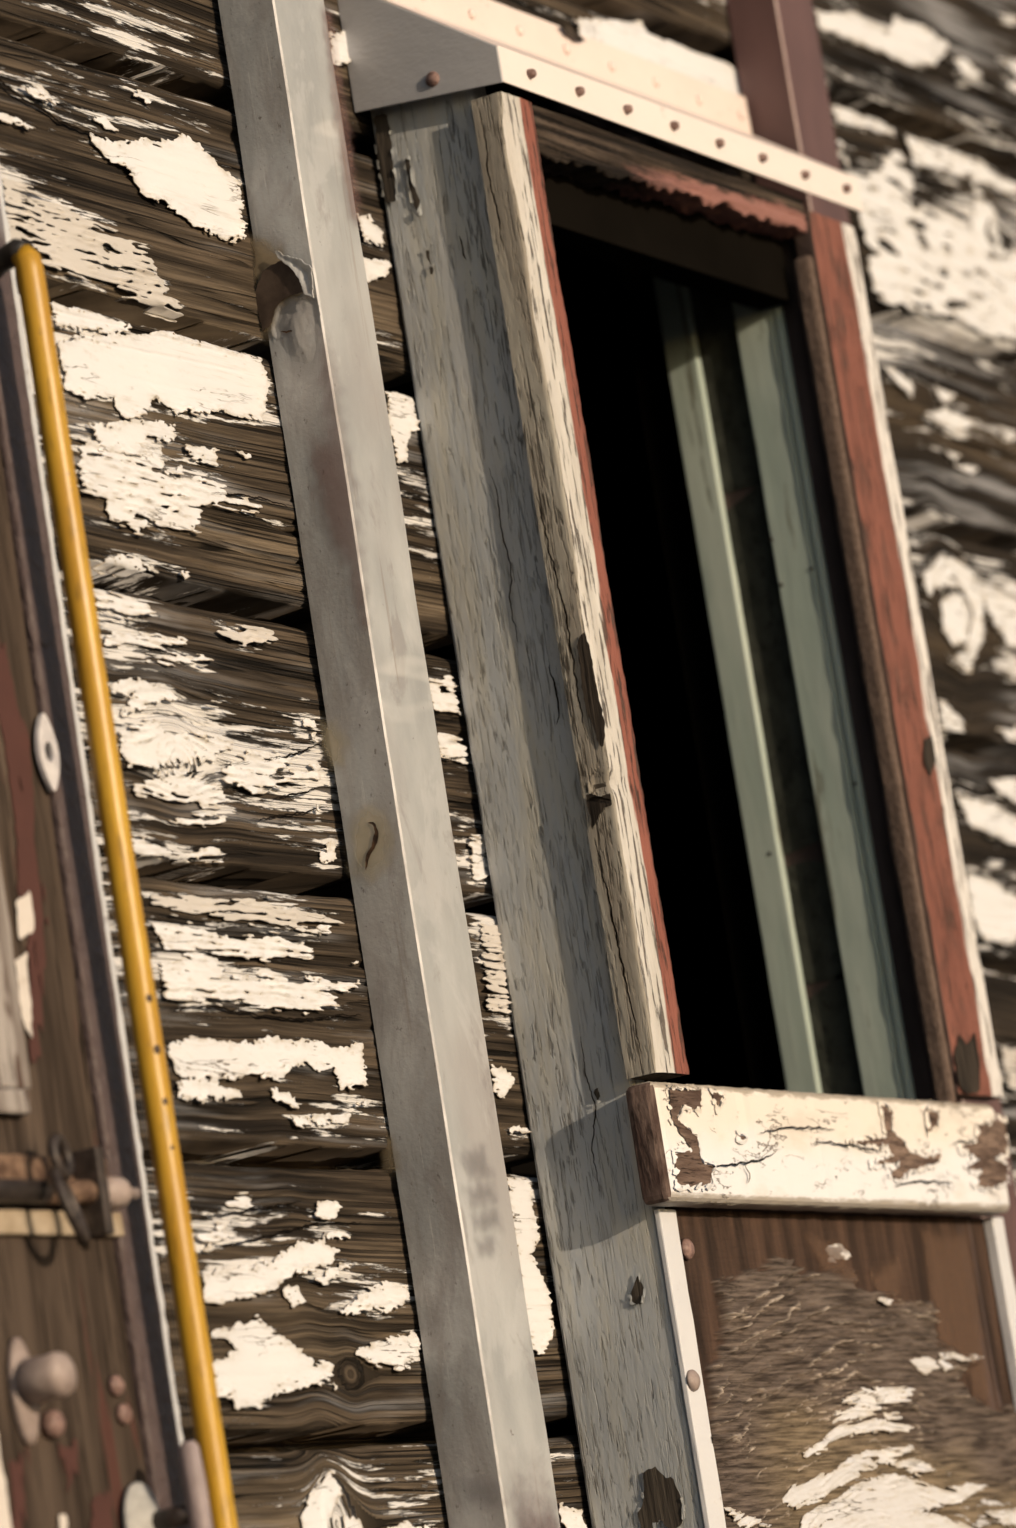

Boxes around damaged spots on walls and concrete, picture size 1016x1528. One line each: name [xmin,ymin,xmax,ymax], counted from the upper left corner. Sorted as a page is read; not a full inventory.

peeling [89,116,248,244]
peeling [830,105,1016,339]
peeling [2,178,270,536]
peeling [922,552,1016,674]
peeling [91,554,321,828]
peeling [956,777,1016,845]
peeling [150,894,361,1015]
peeling [966,872,1016,945]
peeling [167,1035,368,1129]
peeling [196,1192,352,1410]
peeling [355,1330,421,1371]
peeling [782,1352,988,1528]